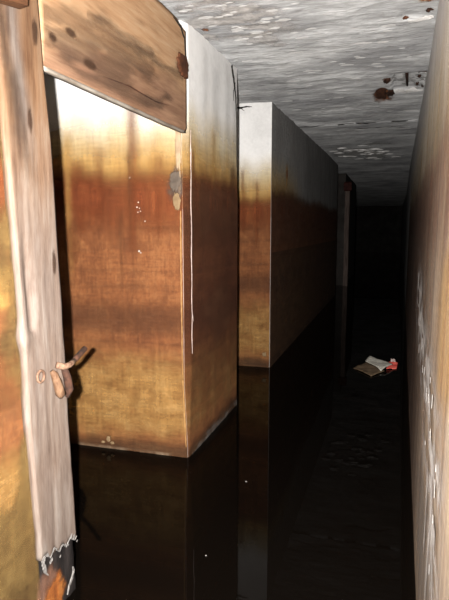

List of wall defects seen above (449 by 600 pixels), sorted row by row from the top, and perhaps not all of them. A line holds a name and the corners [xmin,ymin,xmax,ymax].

spalling [169,131,187,447]
leakage [405,96,449,600]